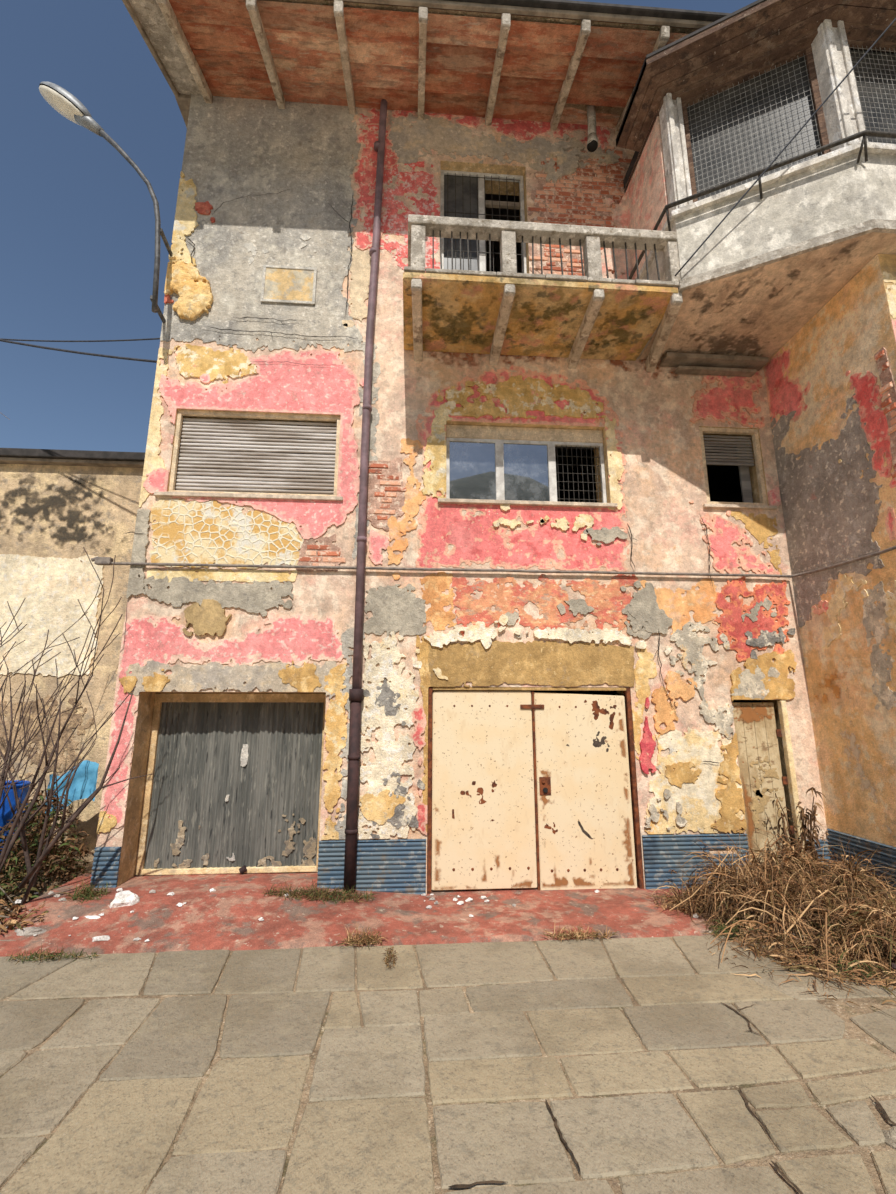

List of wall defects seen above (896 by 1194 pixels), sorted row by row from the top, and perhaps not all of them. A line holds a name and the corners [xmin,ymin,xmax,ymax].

crack [203,195,355,366]
water stain [422,294,486,366]
water stain [522,303,575,329]
water stain [590,307,651,354]
water stain [610,359,676,377]
water stain [0,477,123,545]
flaking render [97,94,896,869]
spalling [0,694,94,778]
corrosion [584,700,625,757]
corrosion [608,819,634,885]